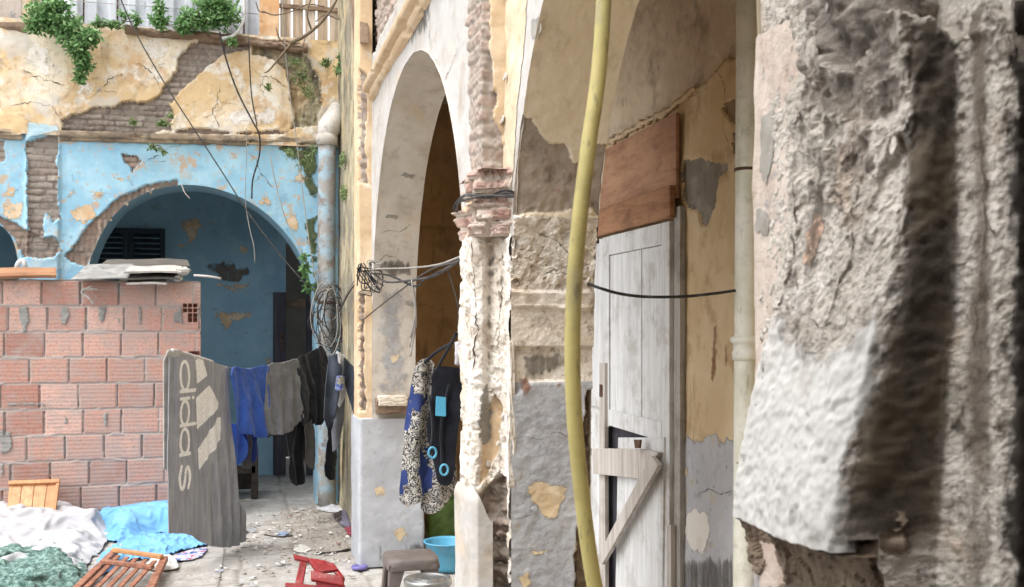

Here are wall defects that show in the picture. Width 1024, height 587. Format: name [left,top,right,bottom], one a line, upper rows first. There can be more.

spalling [0,40,322,270]
peeling [465,0,578,216]
peeling [589,0,736,226]
peeling [215,311,252,330]
peeling [527,481,567,519]
peeling [685,508,710,556]